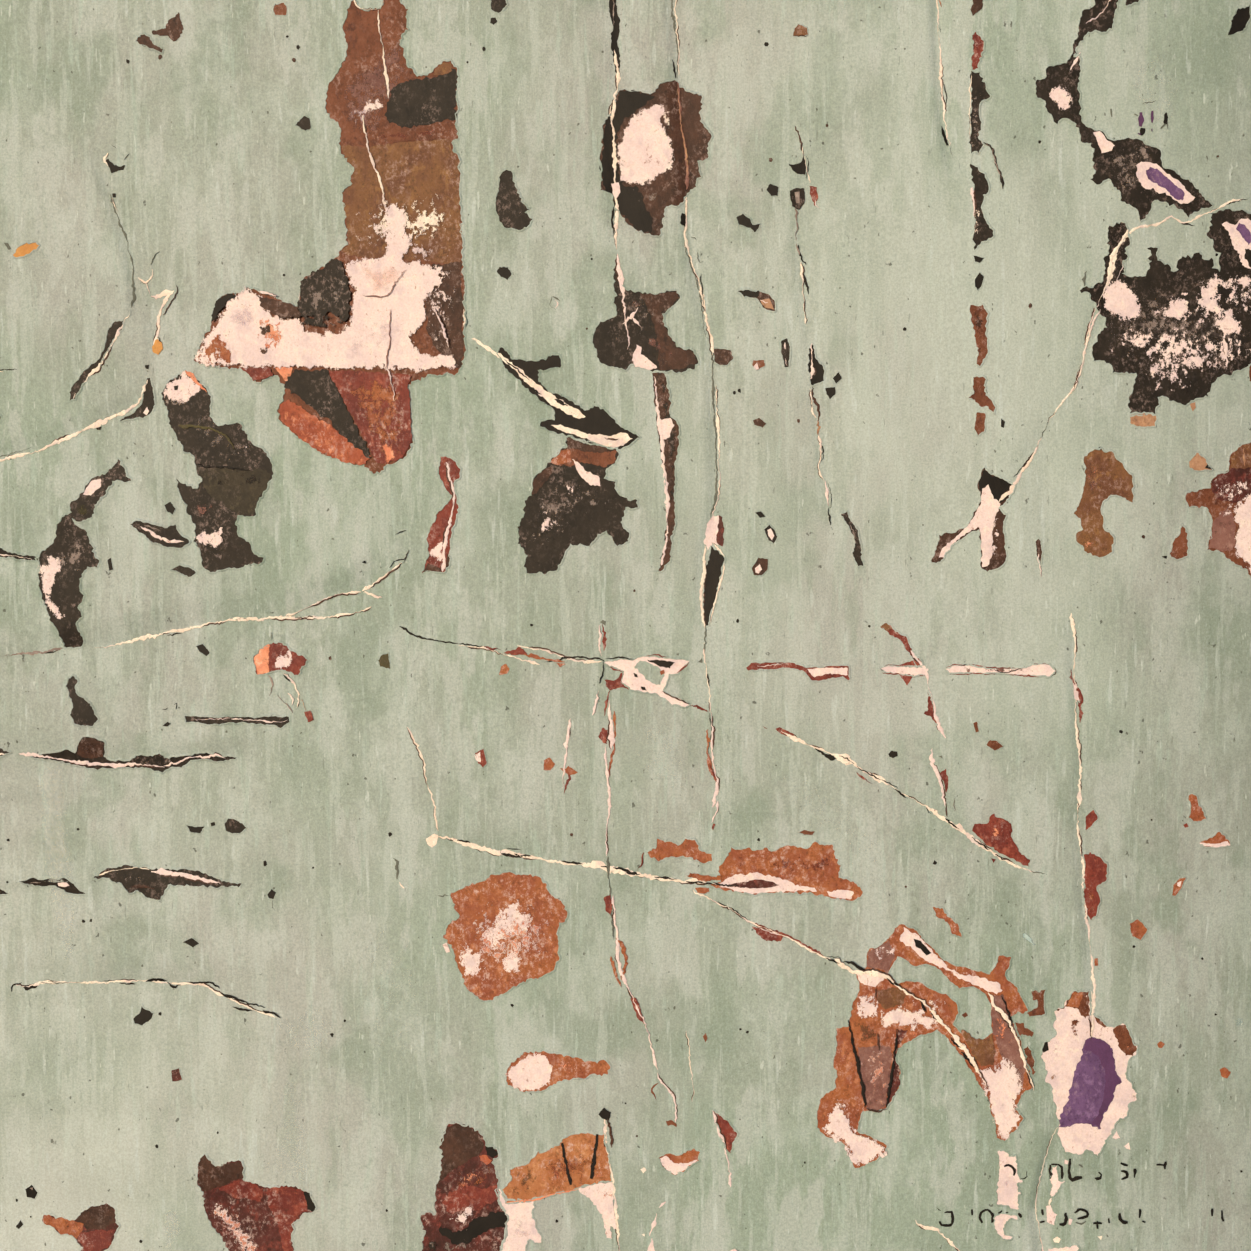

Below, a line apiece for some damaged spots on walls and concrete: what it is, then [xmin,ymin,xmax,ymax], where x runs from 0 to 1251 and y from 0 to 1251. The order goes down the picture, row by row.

peeling [159,0,469,579]
peeling [597,78,714,238]
crack [671,0,680,79]
peeling [1033,0,1251,429]
crack [95,530,409,648]
peeling [516,435,640,577]
crack [472,197,727,830]
crack [393,858,404,888]
crack [399,620,840,1127]
crack [744,613,1096,1022]
peeling [815,922,1139,1170]
peeling [418,1108,617,1251]